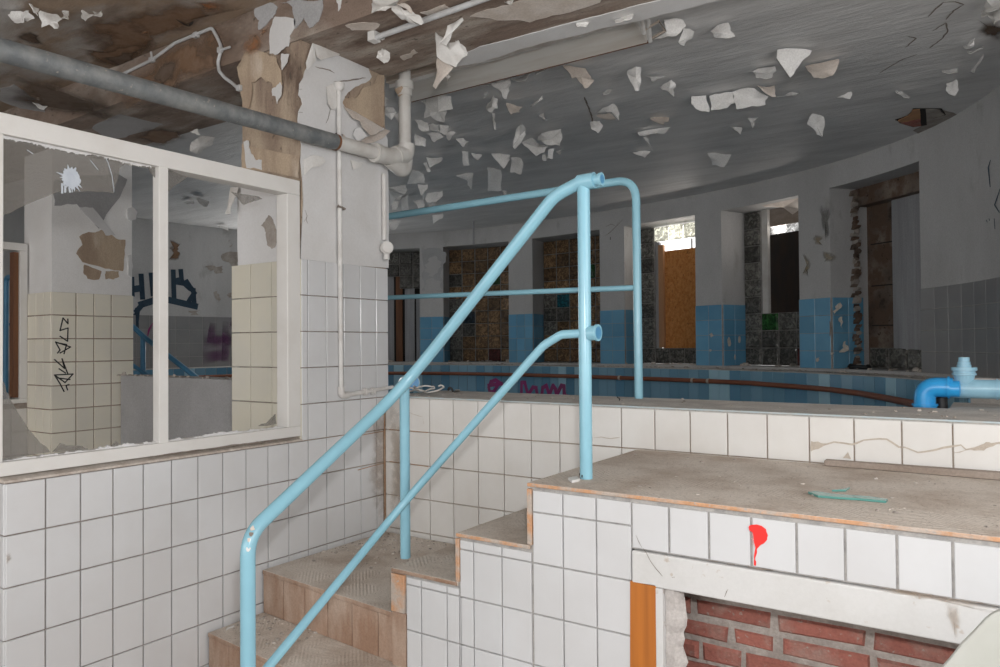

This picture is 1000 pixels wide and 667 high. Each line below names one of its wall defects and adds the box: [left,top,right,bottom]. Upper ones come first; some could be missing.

peeling [8,3,69,29]
peeling [237,0,323,109]
spalling [306,43,399,143]
peeling [345,0,450,63]
peeling [389,0,719,230]
peeling [711,22,735,38]
peeling [691,48,839,136]
crack [880,1,964,73]
spalling [895,91,957,133]
spalling [53,174,133,280]
spalling [816,190,863,365]
crack [810,438,1000,459]